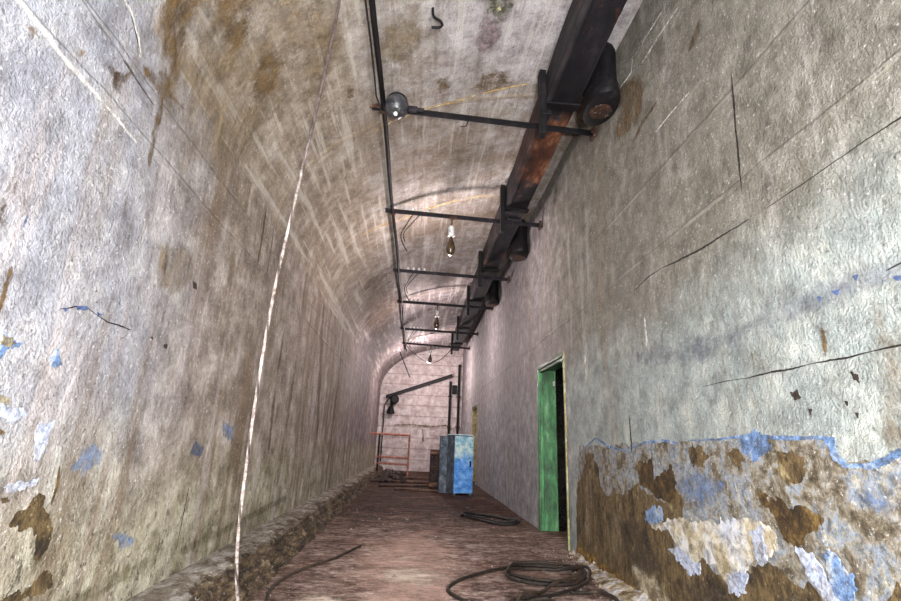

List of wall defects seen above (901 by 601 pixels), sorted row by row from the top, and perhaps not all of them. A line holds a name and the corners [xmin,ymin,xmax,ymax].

water stain [162,0,299,166]
crack [731,74,742,191]
crack [635,117,901,290]
peeling [0,325,23,359]
peeling [47,349,63,368]
crack [703,344,901,387]
peeling [0,395,28,435]
peeling [33,420,56,463]
spalling [1,466,60,562]
peeling [576,429,901,601]
spalling [0,570,53,601]